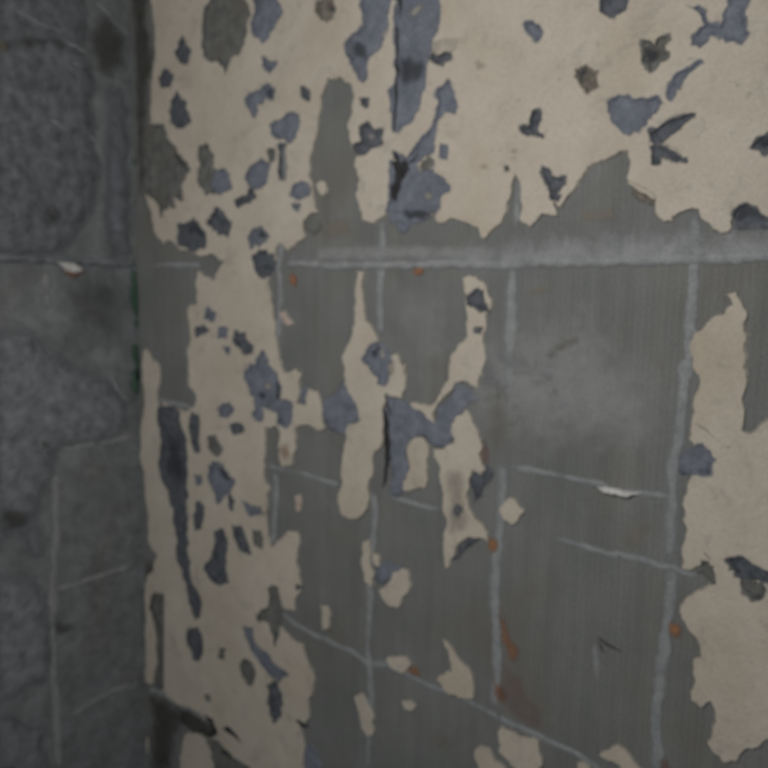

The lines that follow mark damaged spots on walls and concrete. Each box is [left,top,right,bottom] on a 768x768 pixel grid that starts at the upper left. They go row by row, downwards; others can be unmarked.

spalling [344,0,392,83]
spalling [387,0,441,133]
spalling [599,0,629,18]
spalling [639,33,671,73]
spalling [392,79,458,167]
spalling [647,112,706,155]
spalling [385,160,451,225]
crack [382,396,391,487]
spalling [353,270,494,569]
spalling [157,402,202,620]
peeling [679,291,768,763]
peeling [180,732,250,768]